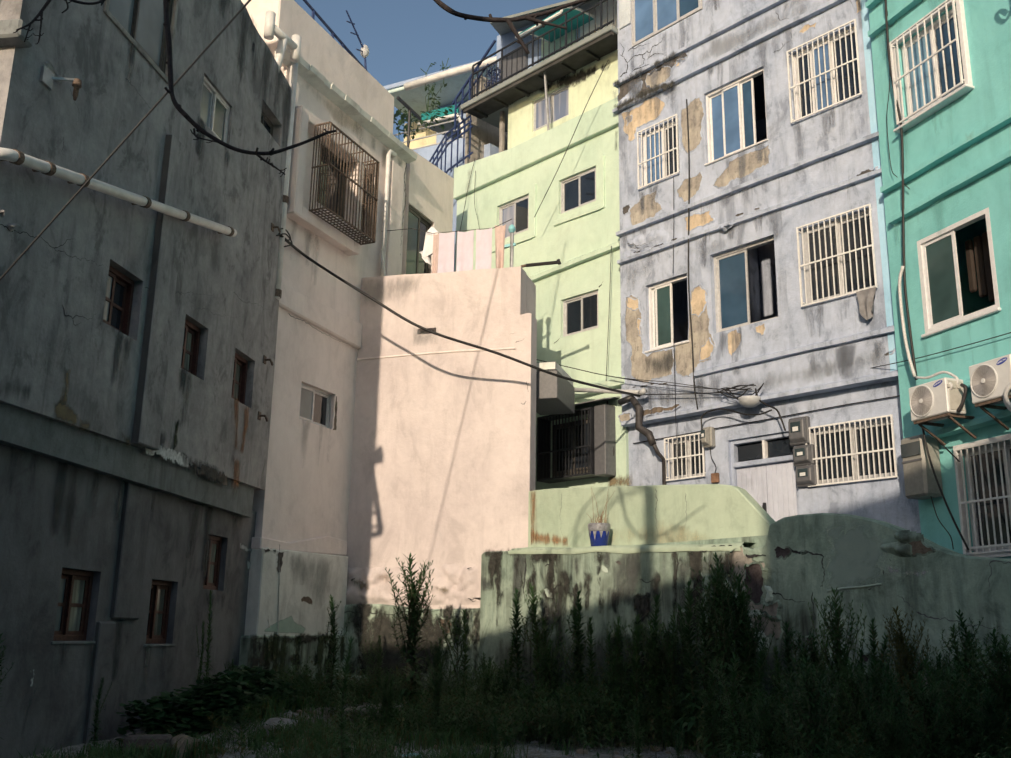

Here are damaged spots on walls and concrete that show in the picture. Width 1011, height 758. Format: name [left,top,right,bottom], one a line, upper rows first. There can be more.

damp [239,12,254,70]
damp [262,47,291,133]
crack [619,38,663,77]
peeling [617,52,688,142]
peeling [680,97,705,154]
peeling [677,144,771,203]
peeling [622,189,663,226]
peeling [625,283,743,388]
damp [483,549,804,692]
crack [639,545,766,612]
spalling [724,544,807,654]
crack [772,549,825,615]